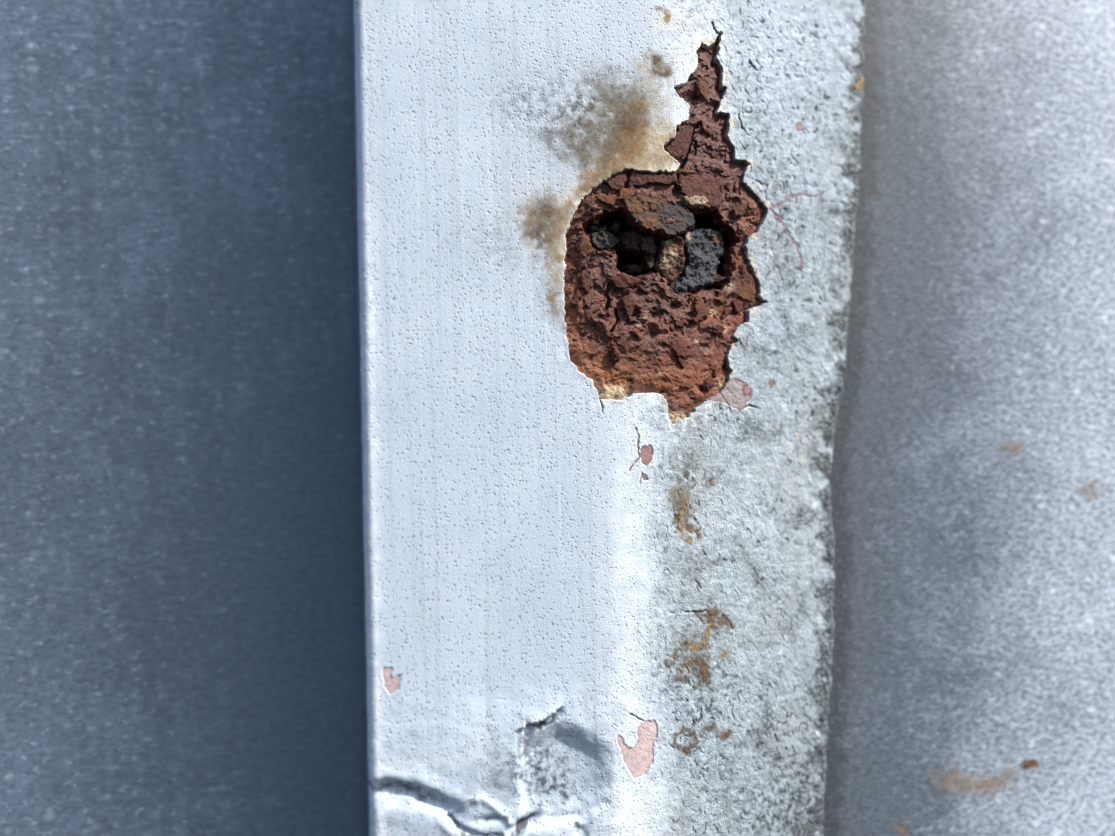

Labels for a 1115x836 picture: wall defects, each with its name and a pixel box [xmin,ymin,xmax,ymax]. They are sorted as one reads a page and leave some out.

corrosion [529,40,765,424]
peeling [705,379,756,410]
corrosion [668,472,701,544]
corrosion [665,608,732,683]
peeling [383,667,400,694]
peeling [617,713,657,778]
corrosion [671,725,731,755]